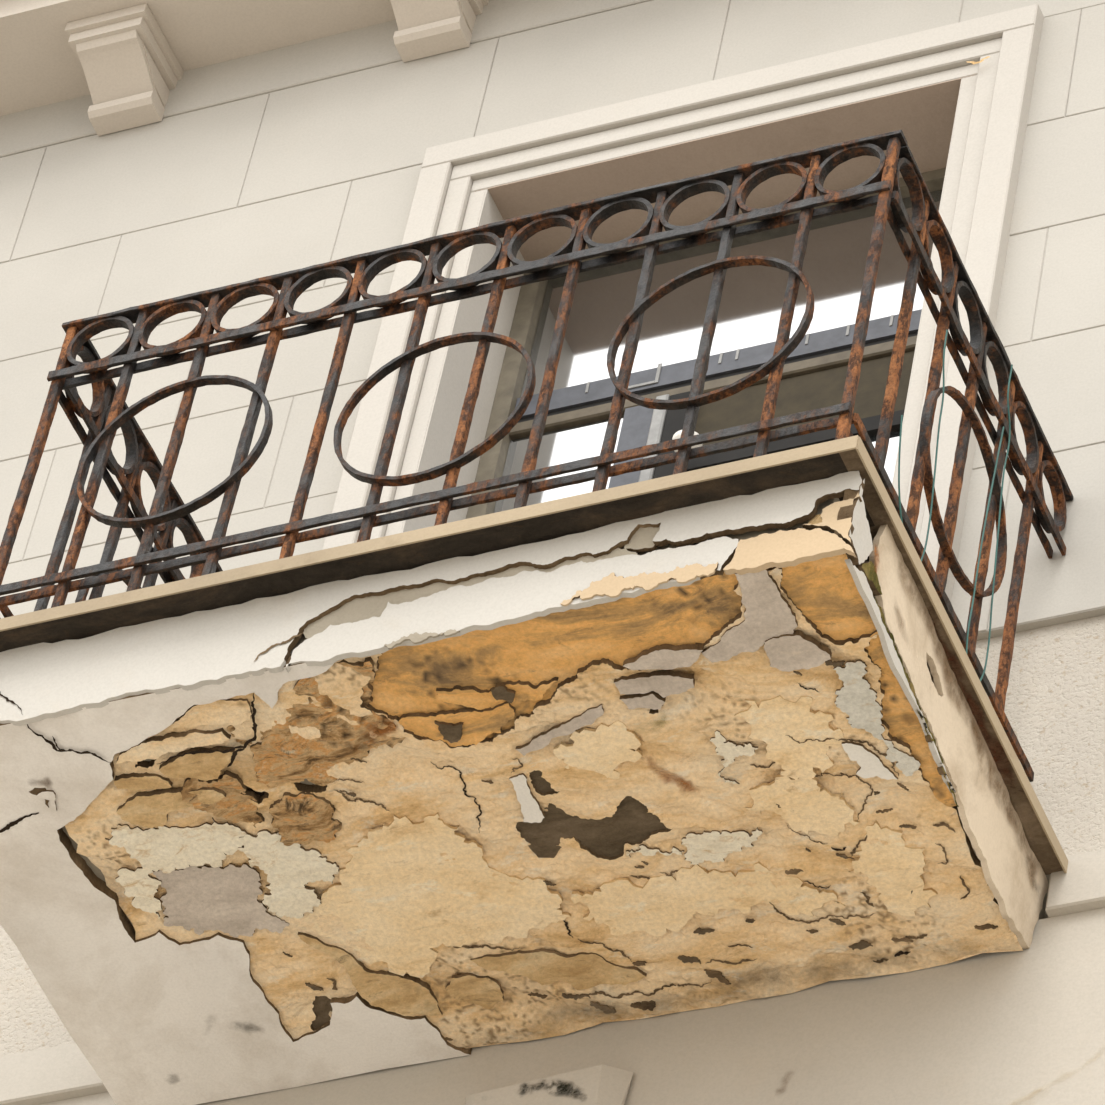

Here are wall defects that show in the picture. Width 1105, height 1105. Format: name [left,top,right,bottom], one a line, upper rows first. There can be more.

spalling [303,527,660,639]
crack [0,694,111,763]
crack [254,633,302,661]
corrosion [933,623,1012,783]
crack [0,813,39,833]
spalling [65,553,1023,1048]